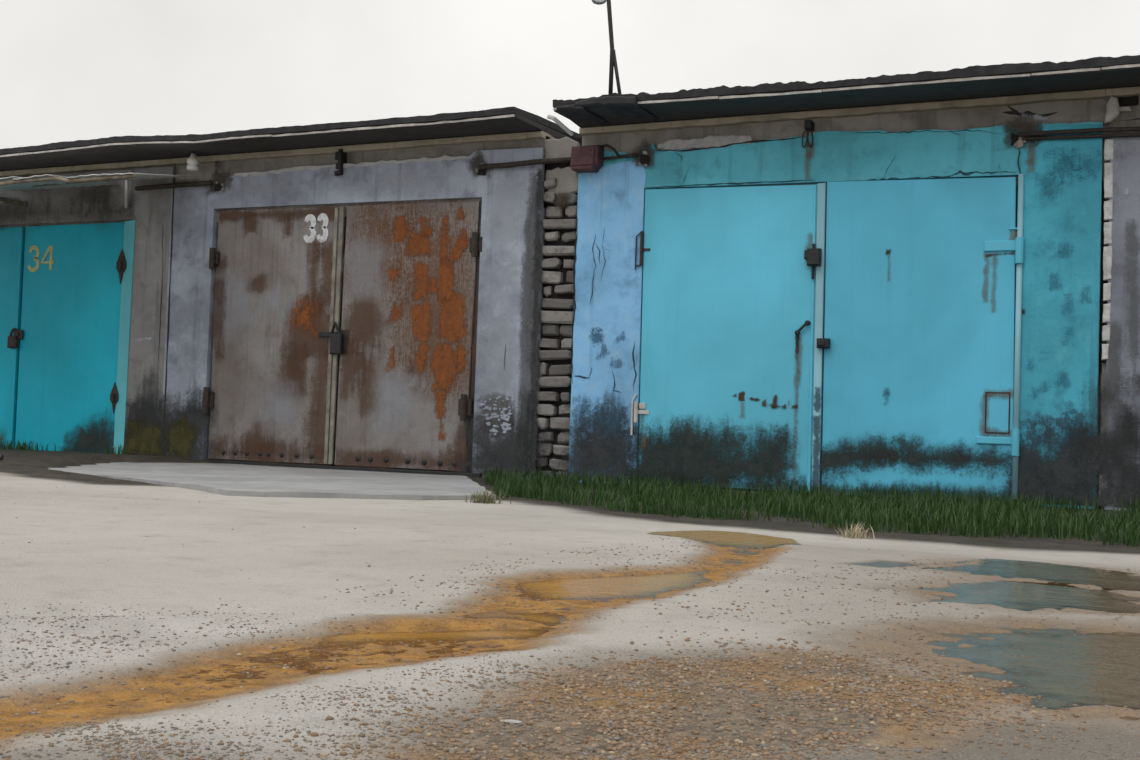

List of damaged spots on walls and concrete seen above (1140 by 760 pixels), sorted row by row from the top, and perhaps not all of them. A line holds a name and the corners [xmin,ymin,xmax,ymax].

damp [62,395,214,460]
rust [212,206,469,471]
damp [459,169,545,477]
damp [560,220,1140,508]